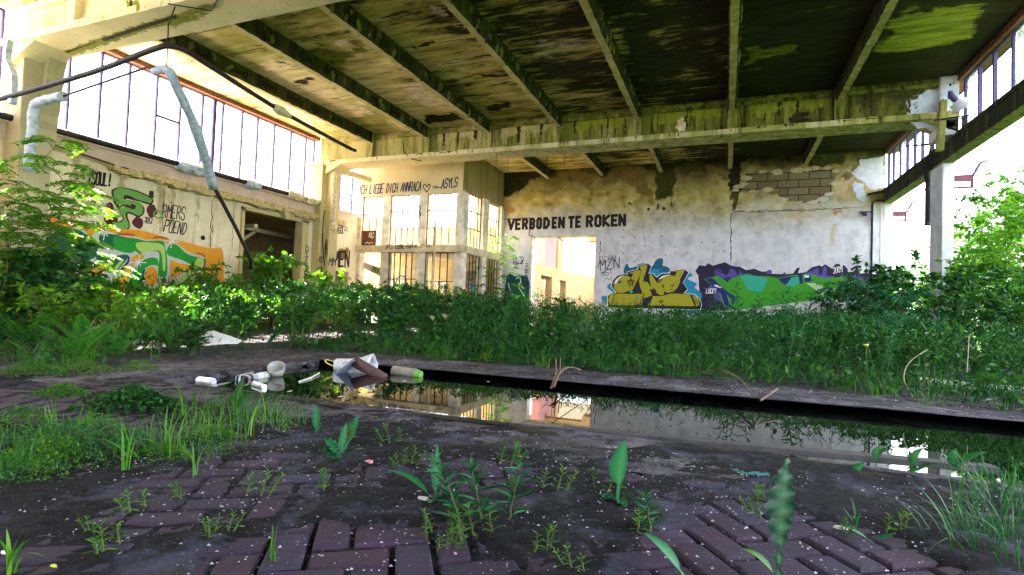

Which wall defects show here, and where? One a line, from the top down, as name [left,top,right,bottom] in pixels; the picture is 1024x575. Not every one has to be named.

leakage [294,77,373,117]
leakage [306,39,369,71]
leakage [429,5,464,32]
leakage [398,82,544,156]
leakage [533,37,619,90]
leakage [669,106,732,137]
leakage [607,13,881,129]
peeling [906,82,959,132]
leakage [867,1,1016,80]
leakage [504,164,678,249]
flaking render [731,156,886,208]
crack [730,206,862,263]